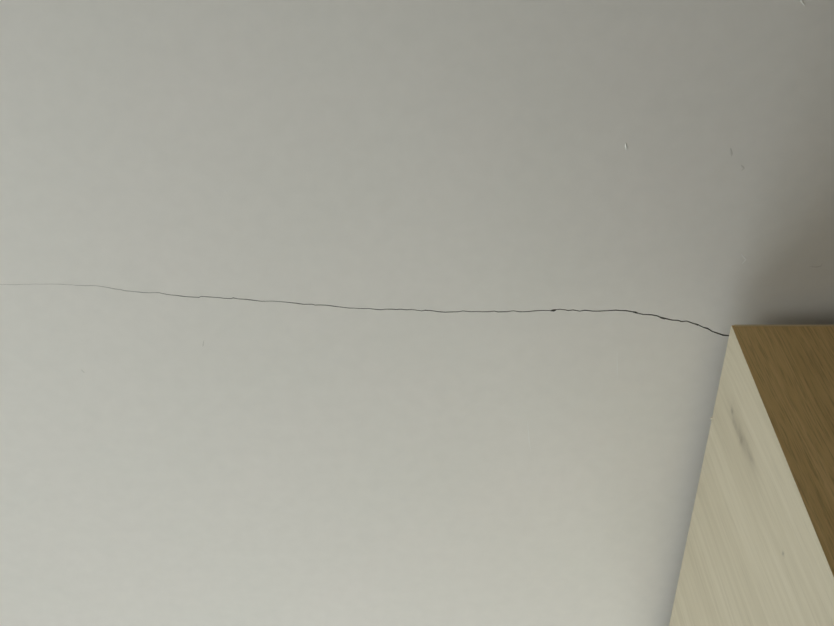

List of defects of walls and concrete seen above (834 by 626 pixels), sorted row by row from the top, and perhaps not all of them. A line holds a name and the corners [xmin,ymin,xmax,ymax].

crack [63,284,729,336]